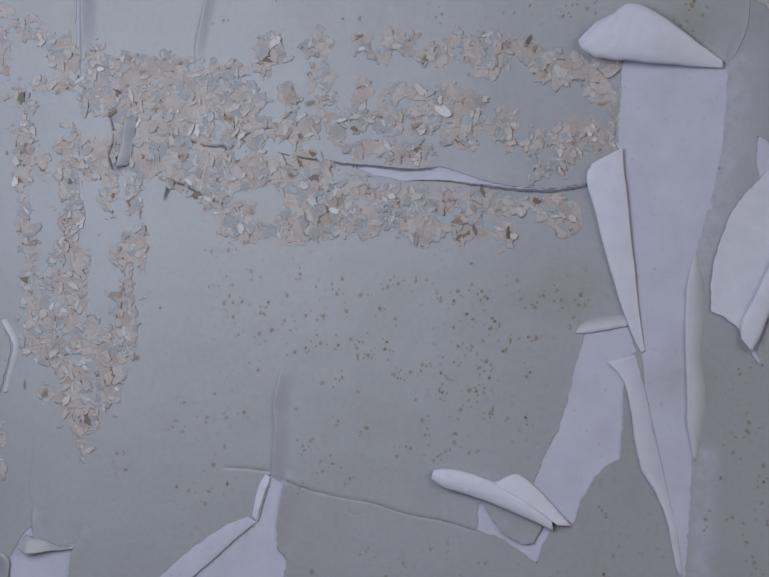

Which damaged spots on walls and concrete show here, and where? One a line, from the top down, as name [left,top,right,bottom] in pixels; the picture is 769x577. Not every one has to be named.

peeling [0,0,583,463]
crack [281,153,587,193]
peeling [350,3,728,577]
peeling [710,136,769,366]
peeling [0,527,75,577]
peeling [160,475,287,577]